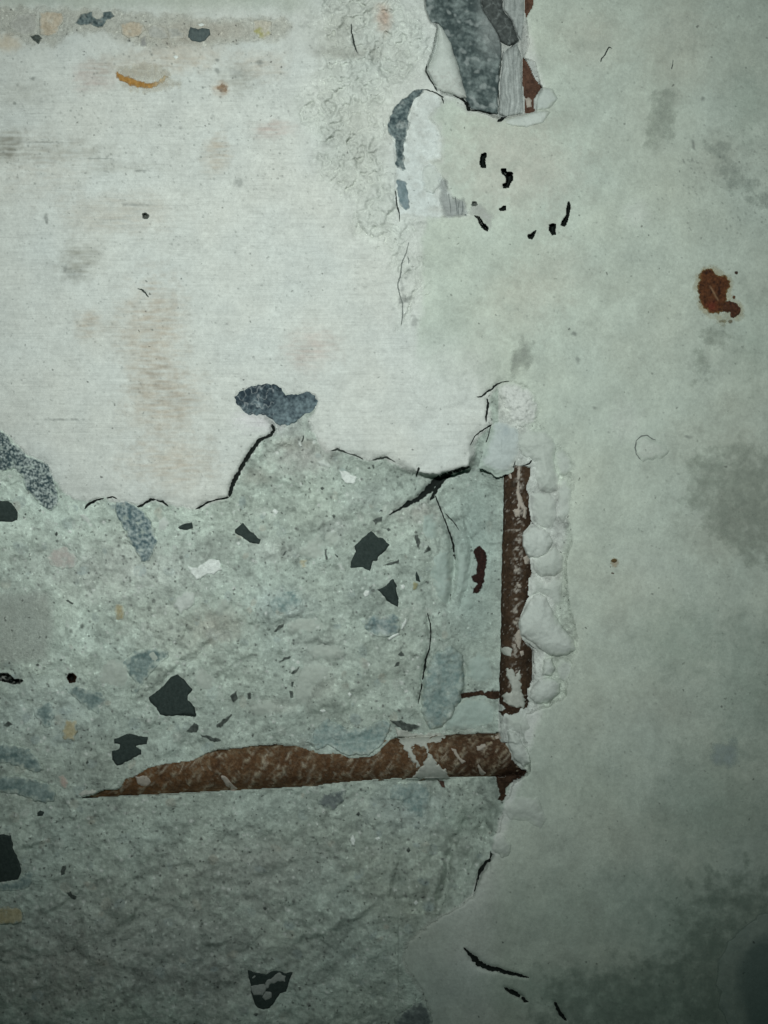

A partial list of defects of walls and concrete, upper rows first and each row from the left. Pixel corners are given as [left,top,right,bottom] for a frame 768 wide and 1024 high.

spalling [387,0,558,231]
corrosion [697,269,741,323]
crack [196,424,275,509]
crack [331,381,508,703]
corrosion [471,546,487,593]
spalling [0,380,579,1024]
corrosion [461,690,520,716]
corrosion [495,760,527,801]
crack [463,947,529,1003]
crack [554,1002,567,1021]